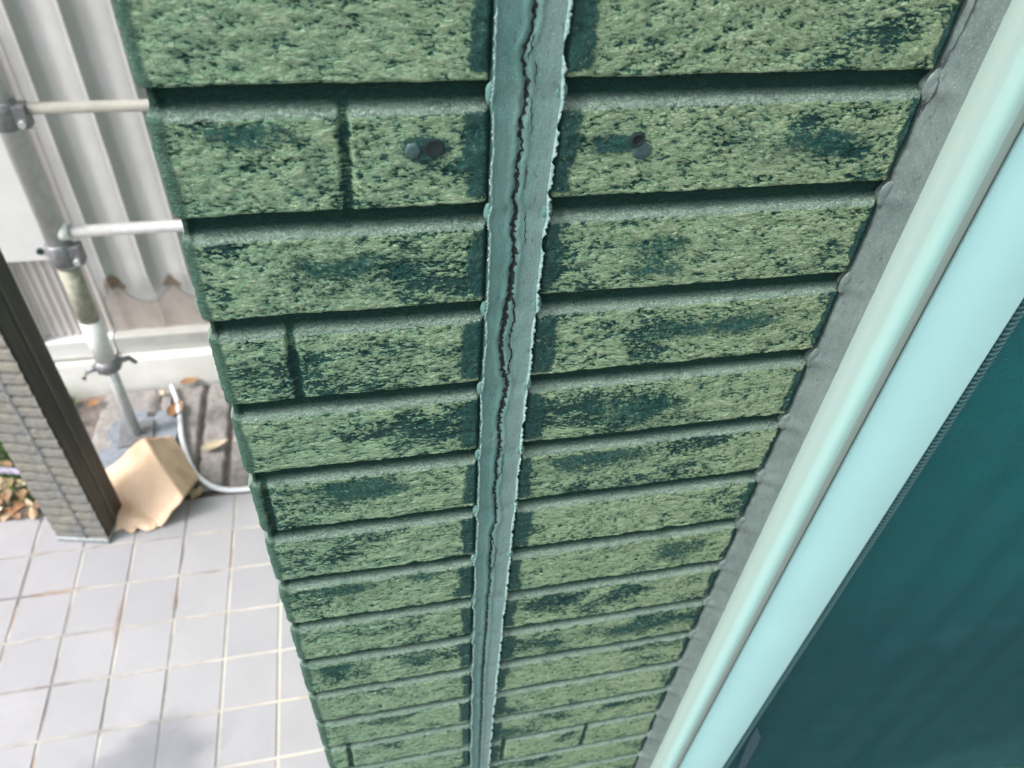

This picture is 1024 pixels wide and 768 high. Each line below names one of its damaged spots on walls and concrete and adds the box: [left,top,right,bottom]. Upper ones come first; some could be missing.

crack [479,0,538,768]